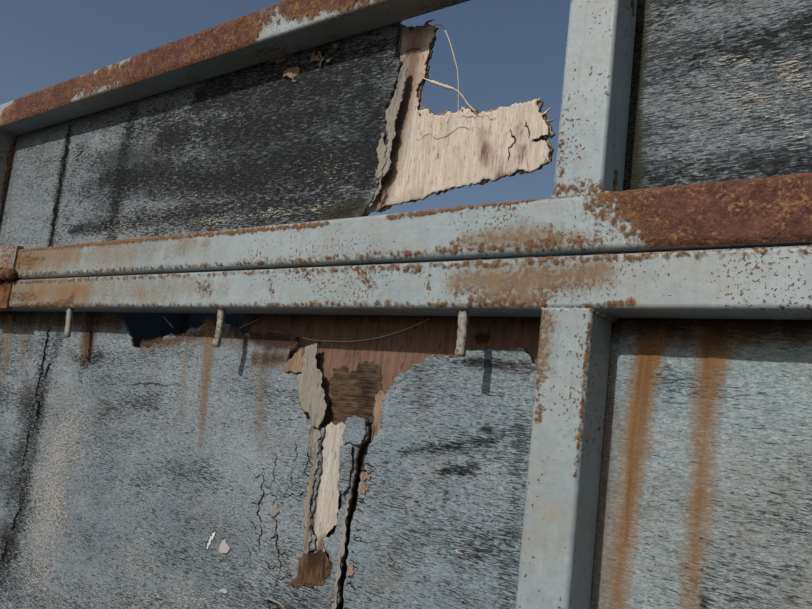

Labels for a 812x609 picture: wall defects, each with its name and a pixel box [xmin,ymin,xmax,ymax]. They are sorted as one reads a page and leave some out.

rust [0,0,384,126]
rust [0,140,812,422]
crack [0,314,57,596]
spalling [205,531,230,554]
crack [248,439,319,593]
peeling [286,416,366,605]
crack [331,445,375,609]
rust [608,328,666,609]
rust [688,329,728,586]